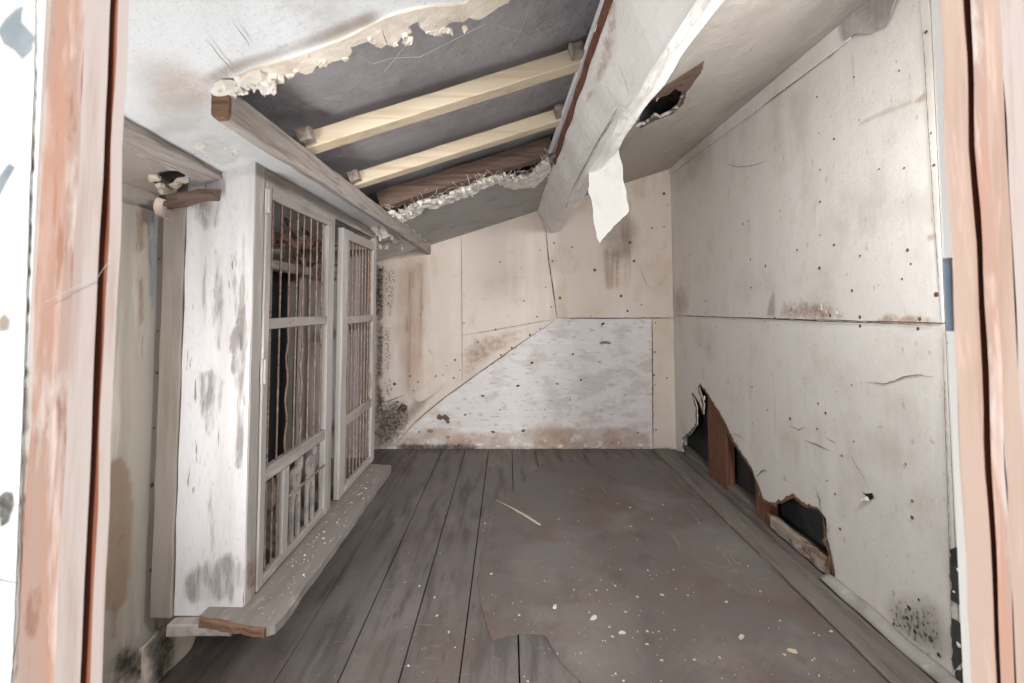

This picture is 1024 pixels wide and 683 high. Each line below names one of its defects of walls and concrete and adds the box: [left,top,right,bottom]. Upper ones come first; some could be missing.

spalling [209,0,510,100]
spalling [640,61,705,128]
spalling [147,171,189,194]
spalling [370,148,552,250]
crack [583,0,941,433]
damp [375,267,407,446]
crack [871,355,952,637]
damp [891,598,942,658]